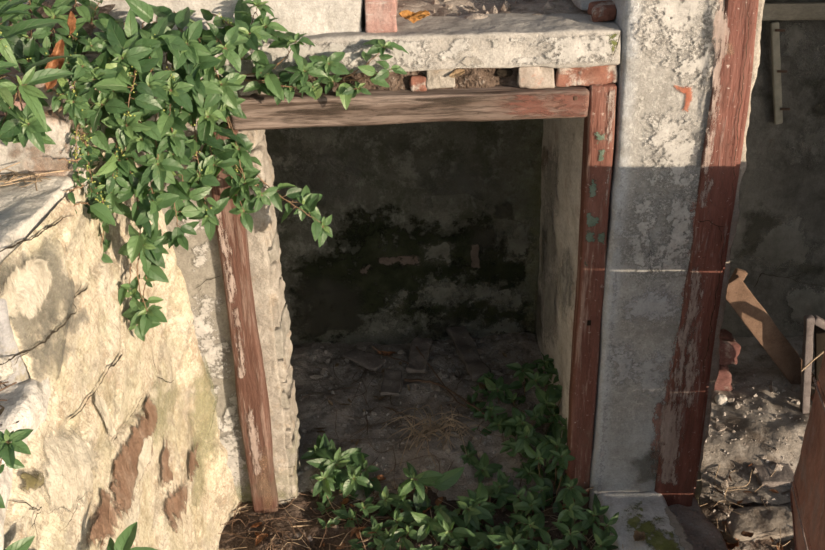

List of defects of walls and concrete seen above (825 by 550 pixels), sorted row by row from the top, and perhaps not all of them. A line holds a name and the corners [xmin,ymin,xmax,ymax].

leakage [294,155,361,203]
crack [0,215,74,252]
peeling [360,241,455,275]
leakage [289,167,542,343]
peeling [621,0,733,485]
crack [0,284,88,365]
crack [69,354,123,420]
leakage [95,392,117,438]
spalling [714,329,741,391]
leakage [130,436,153,514]